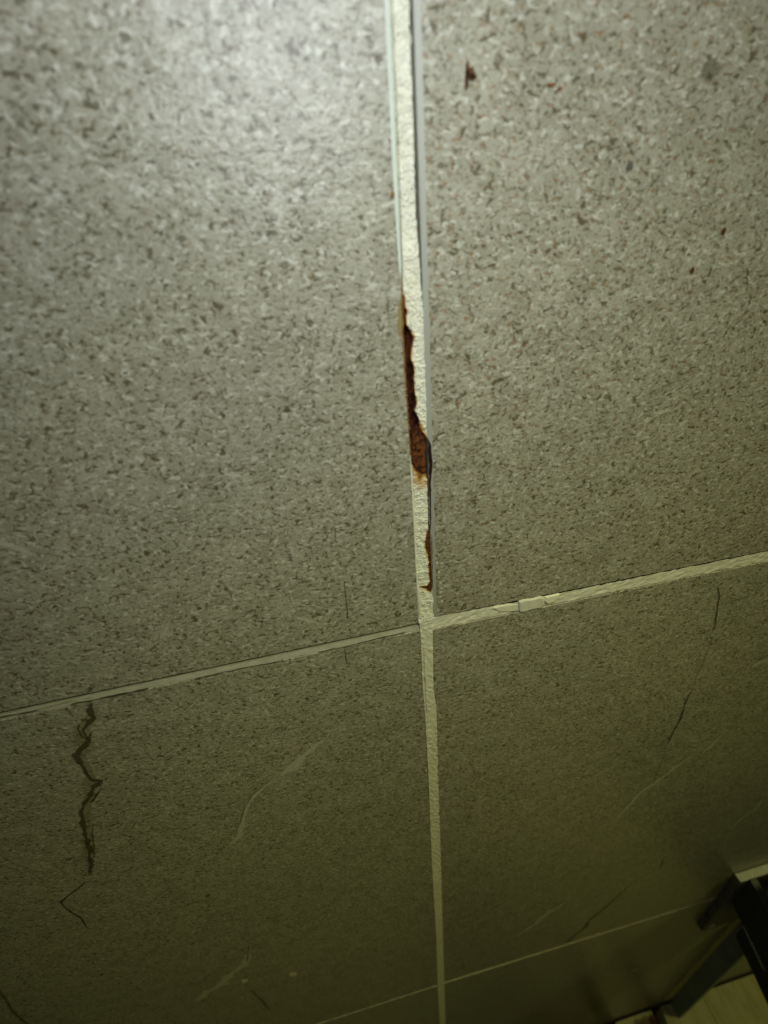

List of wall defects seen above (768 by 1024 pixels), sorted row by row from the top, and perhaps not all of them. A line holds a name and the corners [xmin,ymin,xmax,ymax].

peeling [390,0,434,624]
corrosion [412,429,433,526]
crack [713,587,721,626]
crack [320,632,407,654]
crack [194,661,280,680]
crack [668,692,692,743]
crack [0,688,149,929]